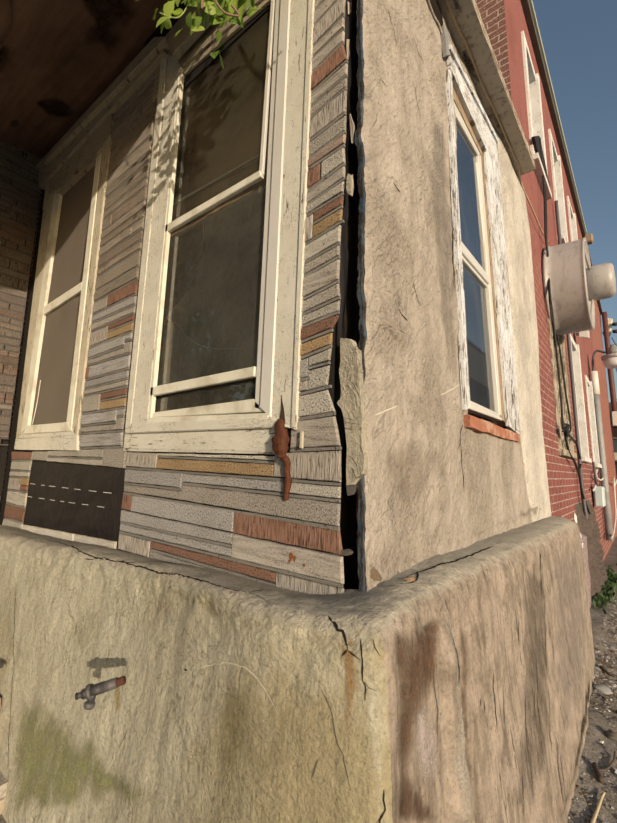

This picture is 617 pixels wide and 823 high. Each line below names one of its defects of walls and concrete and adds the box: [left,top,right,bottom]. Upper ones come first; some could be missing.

rust [271,419,292,501]
crack [44,538,271,605]
crack [402,546,493,584]
crack [328,615,380,698]
damp [522,583,546,766]
damp [18,711,130,806]
crack [322,691,351,790]
damp [399,623,439,818]
damp [449,621,472,815]
damp [576,687,590,765]
crack [376,792,386,823]